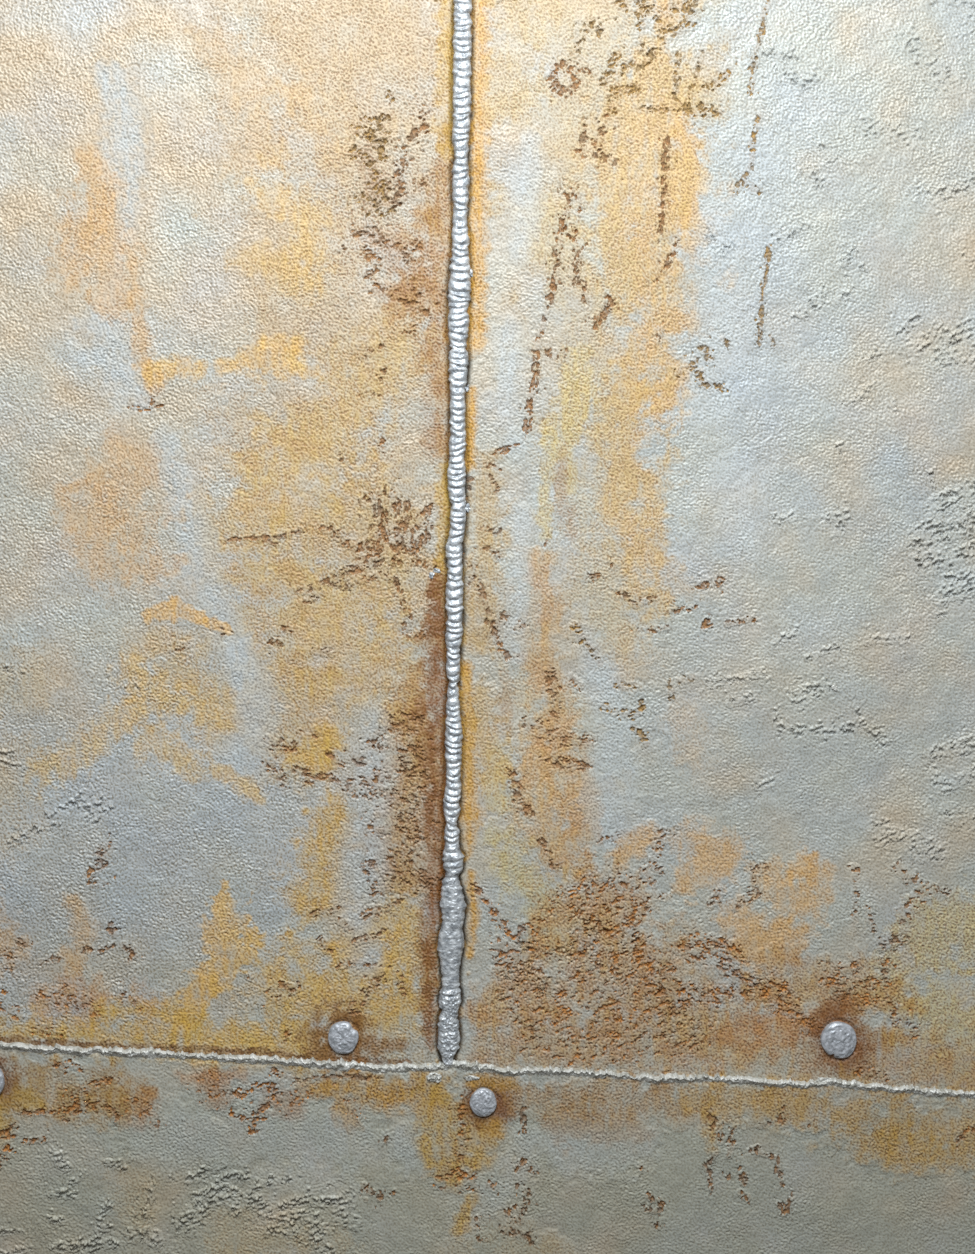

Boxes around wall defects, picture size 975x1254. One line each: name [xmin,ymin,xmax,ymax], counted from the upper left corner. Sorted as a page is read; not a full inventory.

rust [0,0,455,1136]
rust [255,0,975,1254]